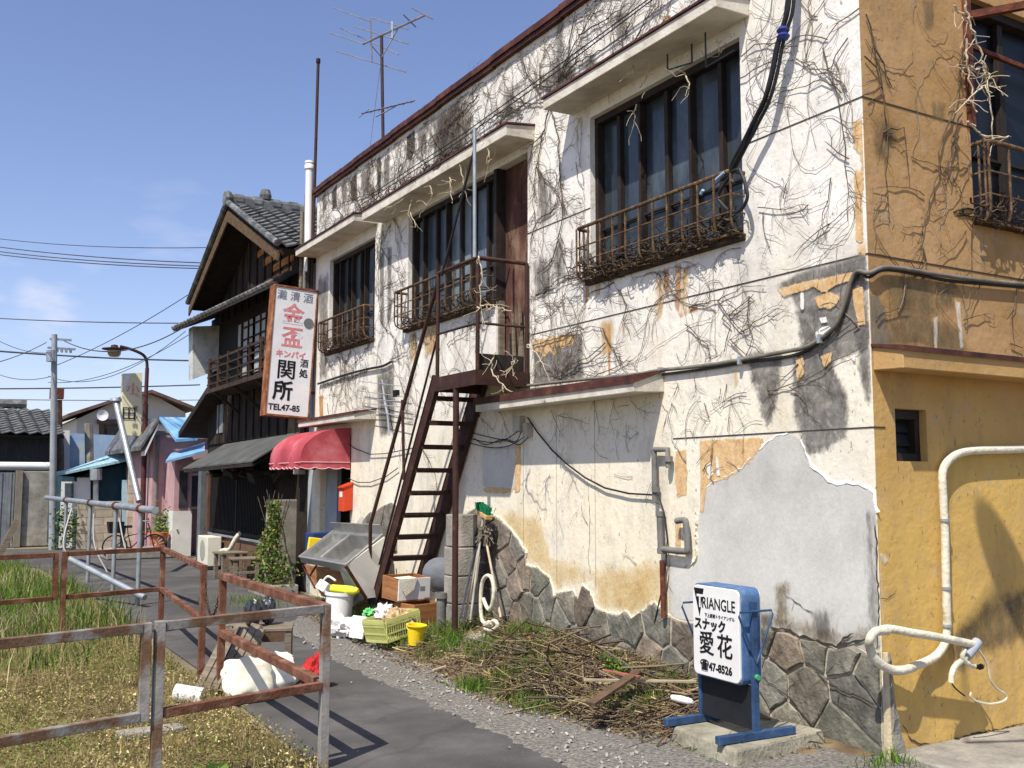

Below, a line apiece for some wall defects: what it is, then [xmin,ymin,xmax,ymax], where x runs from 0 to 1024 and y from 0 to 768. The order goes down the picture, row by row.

peeling [852,118,865,258]
rust [658,267,697,318]
peeling [779,272,866,335]
water stain [750,352,782,425]
peeling [795,357,804,381]
water stain [780,253,966,454]
water stain [506,516,668,613]
flaking render [525,433,906,759]